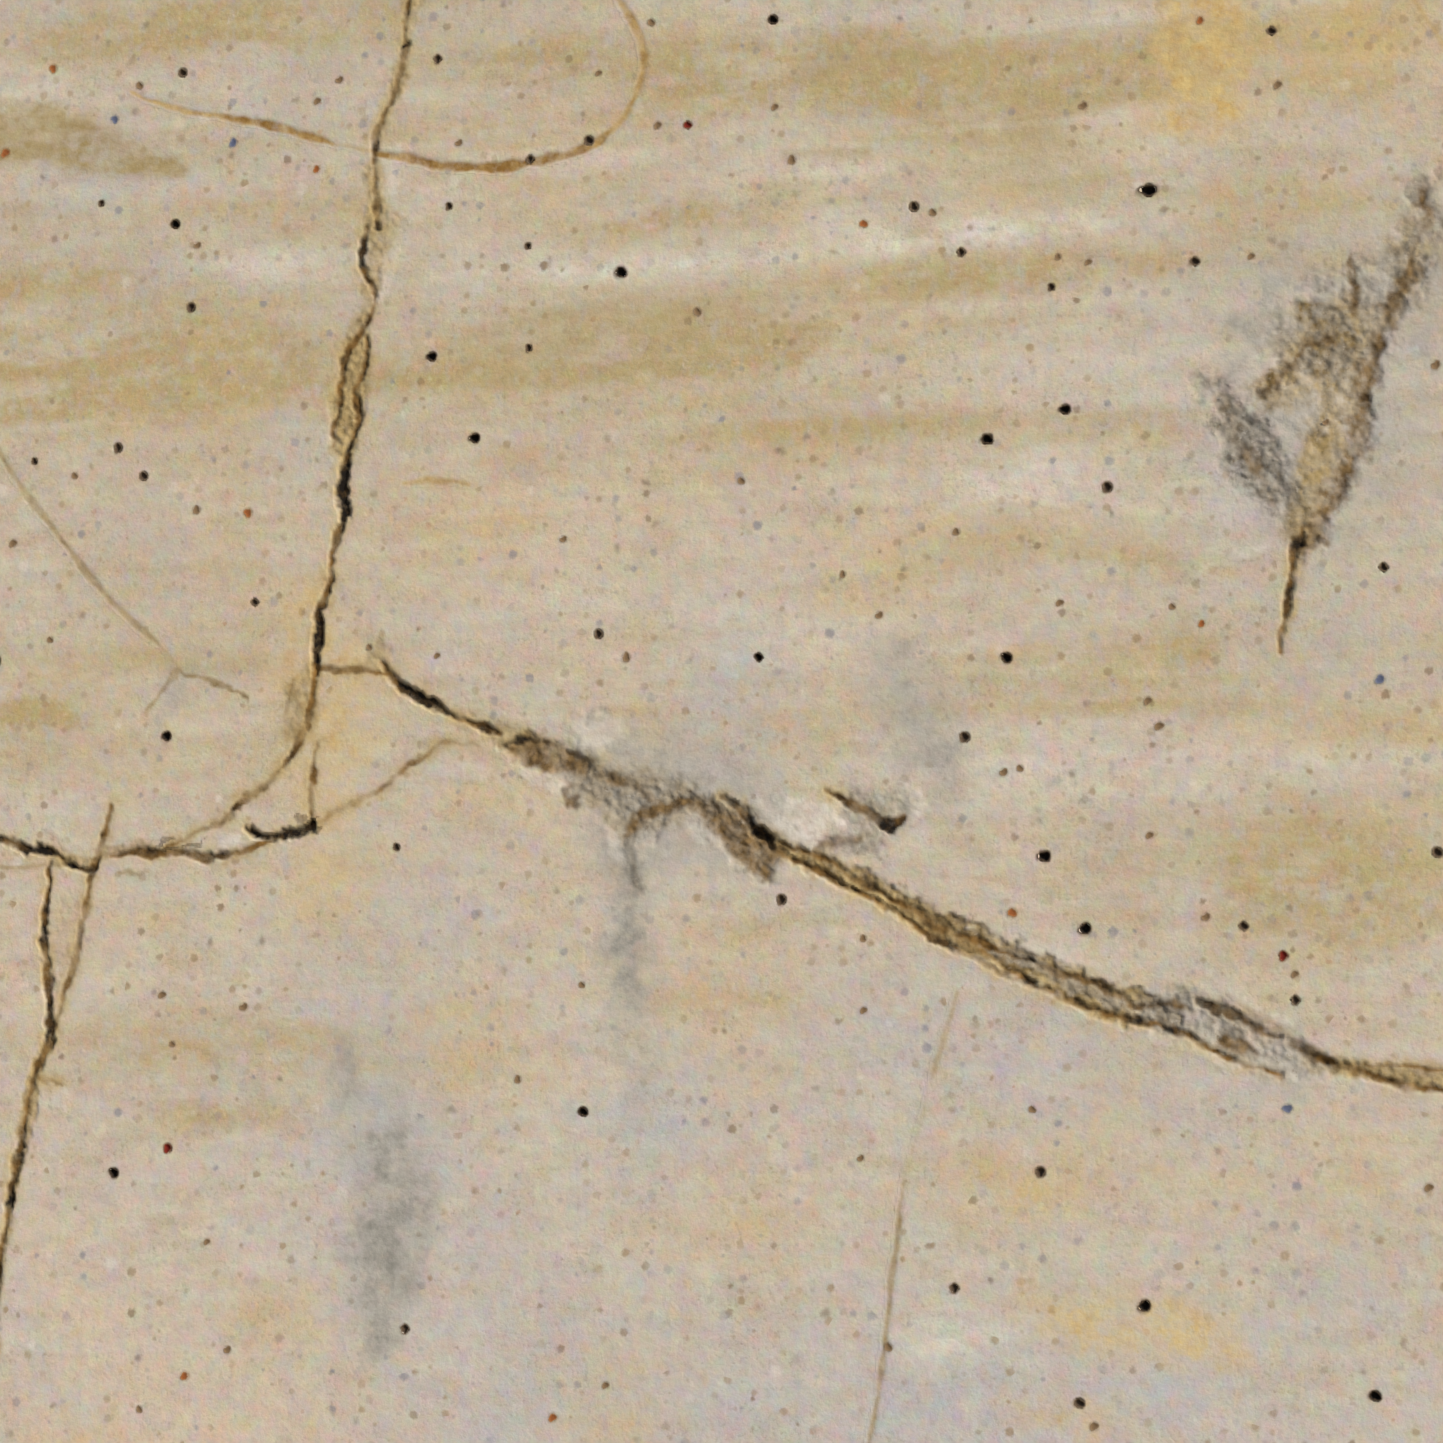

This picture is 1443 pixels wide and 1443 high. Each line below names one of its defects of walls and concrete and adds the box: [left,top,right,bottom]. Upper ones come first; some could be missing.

crack [1407,0,1443,52]
crack [0,0,651,1367]
crack [749,837,1443,1443]